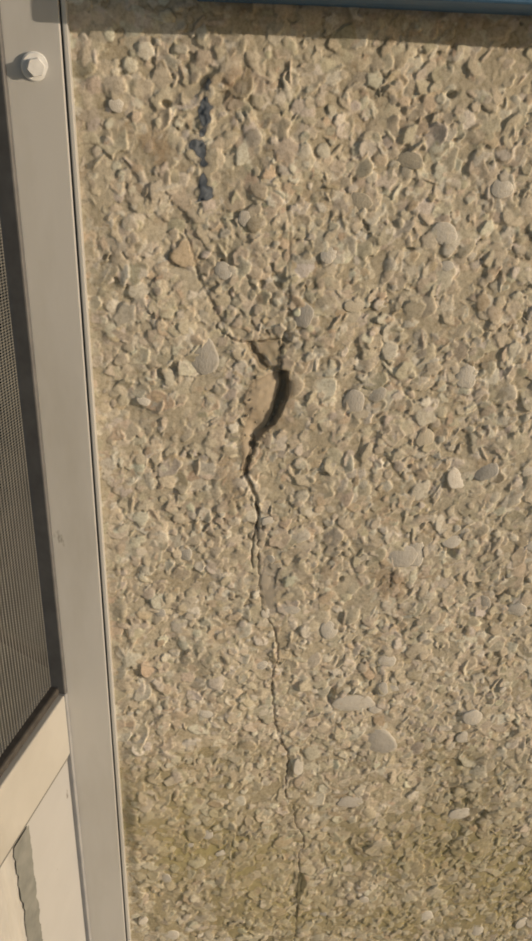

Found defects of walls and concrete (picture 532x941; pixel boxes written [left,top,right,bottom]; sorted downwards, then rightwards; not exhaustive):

spalling [241,341,294,467]
crack [243,433,304,866]